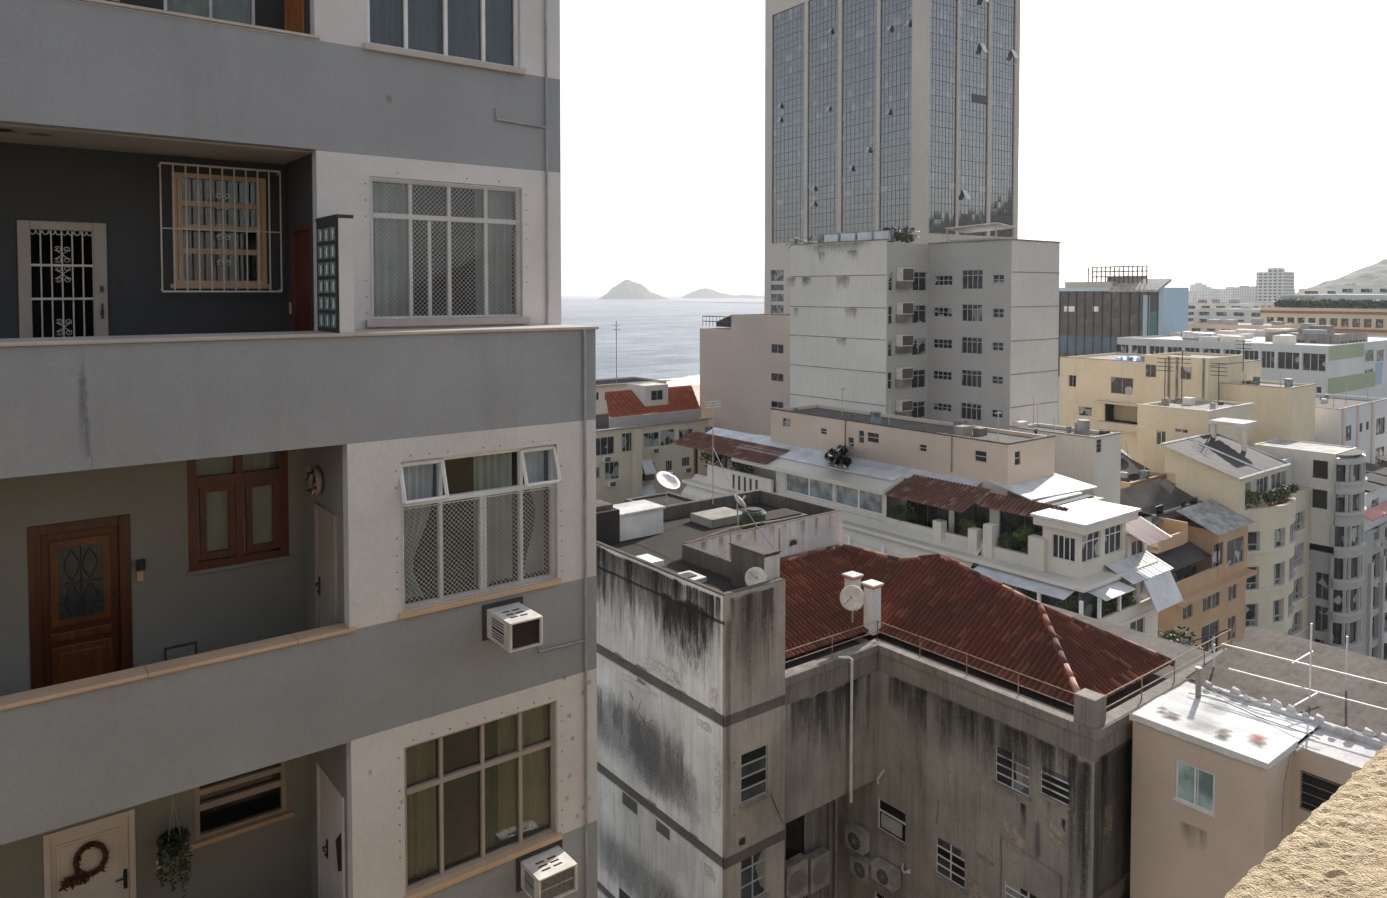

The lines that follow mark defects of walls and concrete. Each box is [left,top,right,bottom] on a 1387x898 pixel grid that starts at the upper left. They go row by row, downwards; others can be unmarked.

damp [596,545,773,667]
damp [890,678,1132,846]